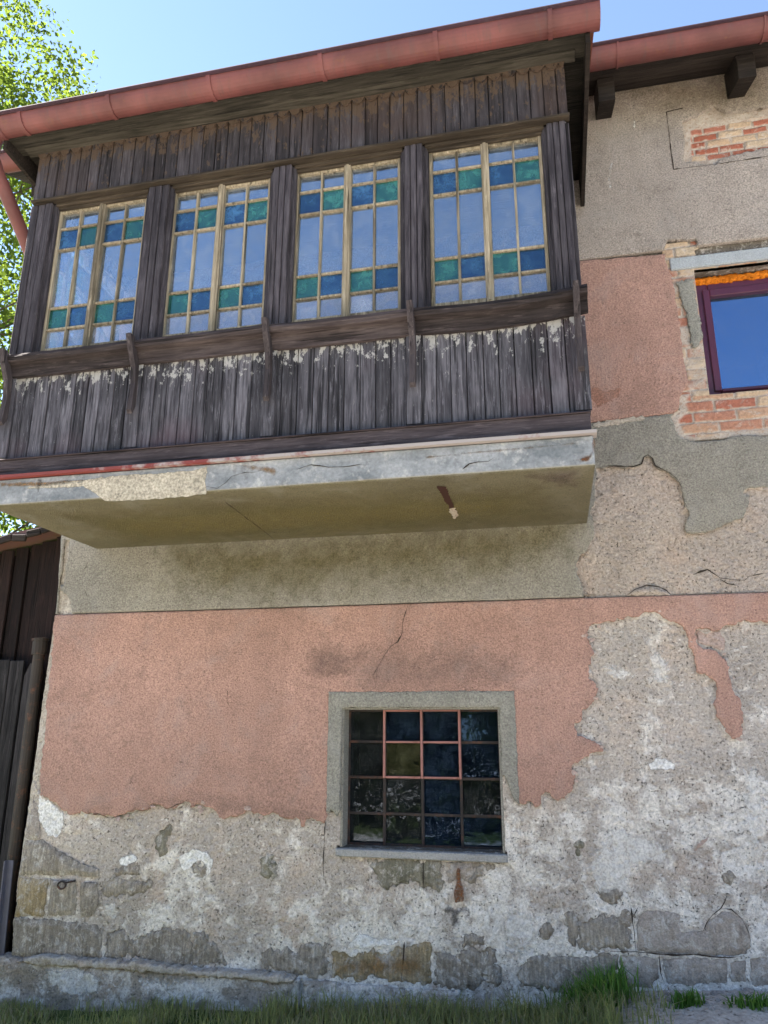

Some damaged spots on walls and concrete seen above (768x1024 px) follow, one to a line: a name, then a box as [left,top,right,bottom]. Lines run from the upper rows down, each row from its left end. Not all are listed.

flaking render [682,108,768,165]
flaking render [662,241,768,441]
spalling [28,467,207,501]
flaking render [576,457,768,598]
crack [693,569,763,586]
crack [373,586,422,681]
flaking render [14,610,768,1012]